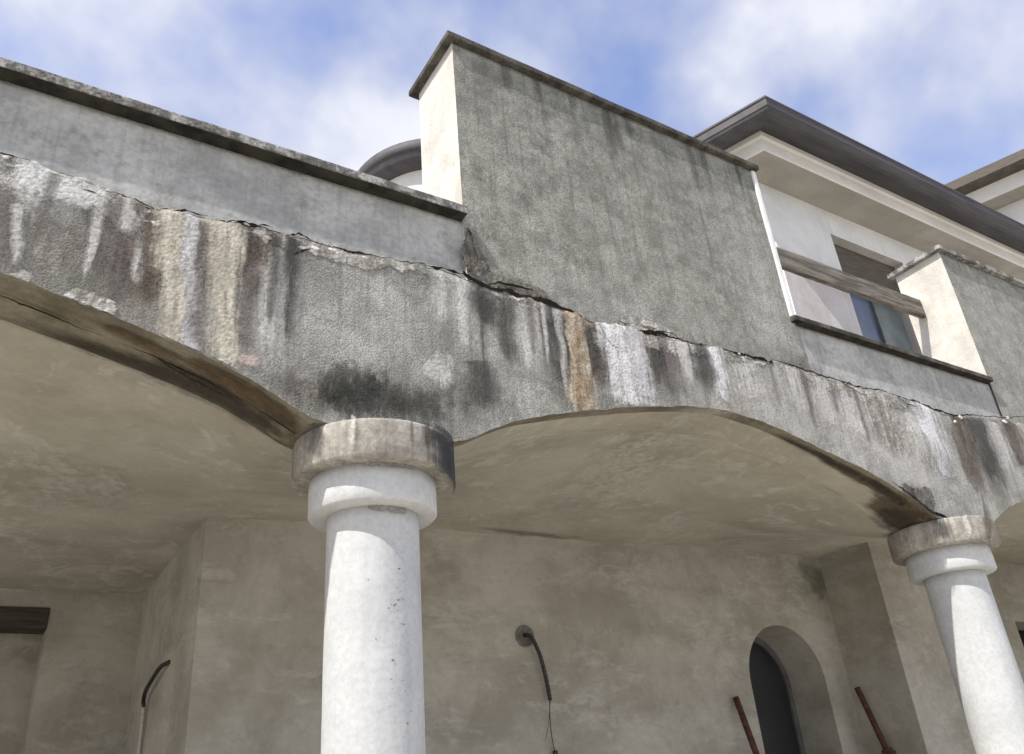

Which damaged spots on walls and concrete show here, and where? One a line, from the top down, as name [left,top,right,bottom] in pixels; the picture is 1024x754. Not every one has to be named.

crack [0,295,295,434]
water stain [0,160,299,366]
water stain [319,355,456,492]
water stain [436,270,572,401]
flaking render [462,224,567,323]
crack [60,173,1023,419]
rust [562,310,598,411]
water stain [586,320,762,406]
flaking render [616,315,750,364]
water stain [768,361,875,441]
water stain [905,402,1024,537]